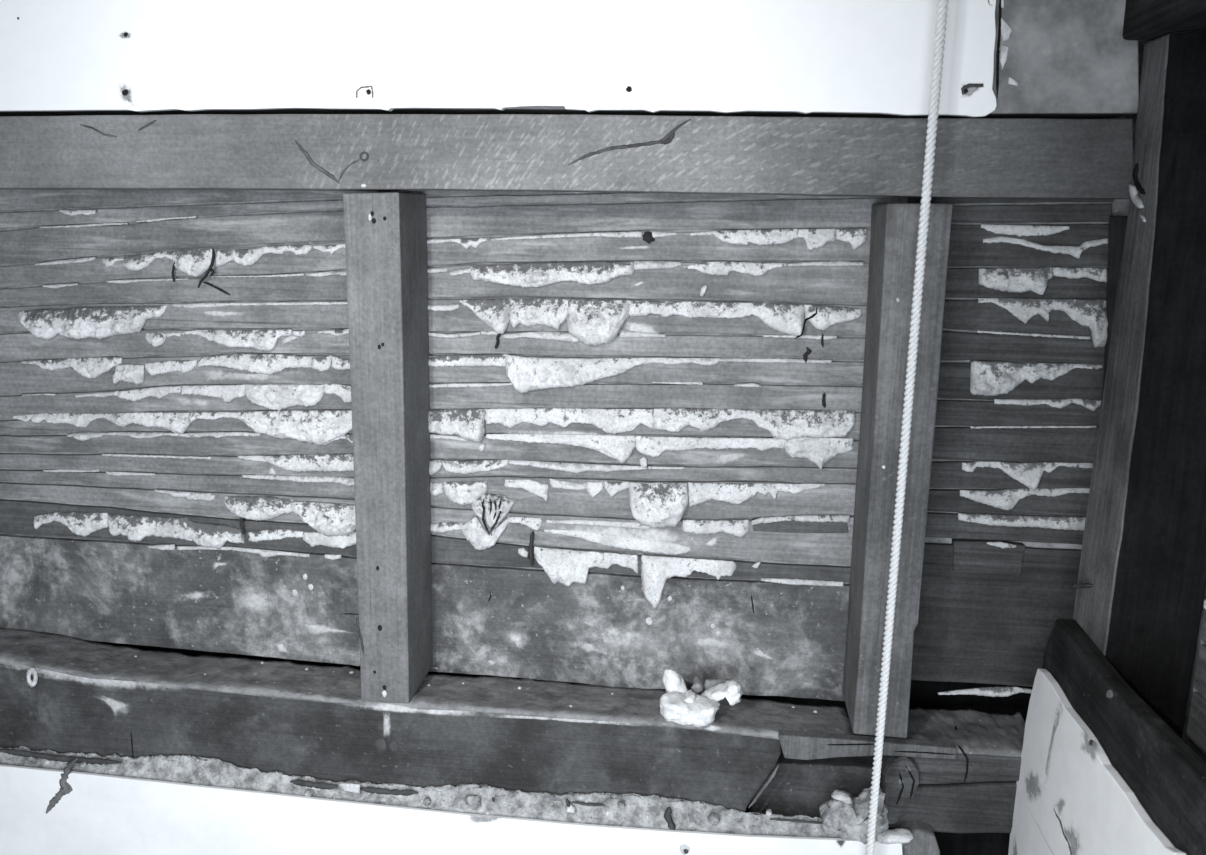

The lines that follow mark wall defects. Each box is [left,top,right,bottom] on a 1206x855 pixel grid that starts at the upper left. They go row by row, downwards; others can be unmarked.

crack [295,140,360,184]
crack [568,119,691,165]
water stain [1026,712,1059,798]
crack [46,757,78,814]